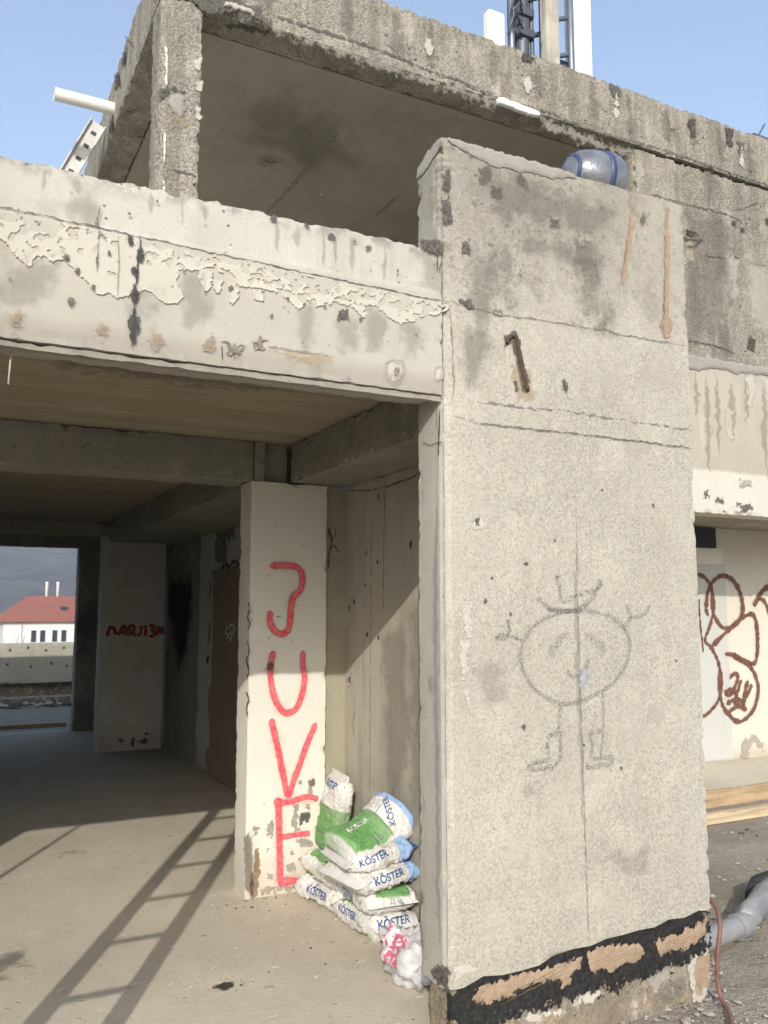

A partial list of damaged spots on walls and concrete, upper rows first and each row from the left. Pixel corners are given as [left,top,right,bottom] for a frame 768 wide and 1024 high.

damp [127,234,144,347]
peeling [0,212,449,325]
crack [0,206,734,449]
rust [619,209,635,286]
rust [660,211,673,339]
peeling [243,820,295,899]
peeling [286,779,316,873]
spalling [431,961,479,995]